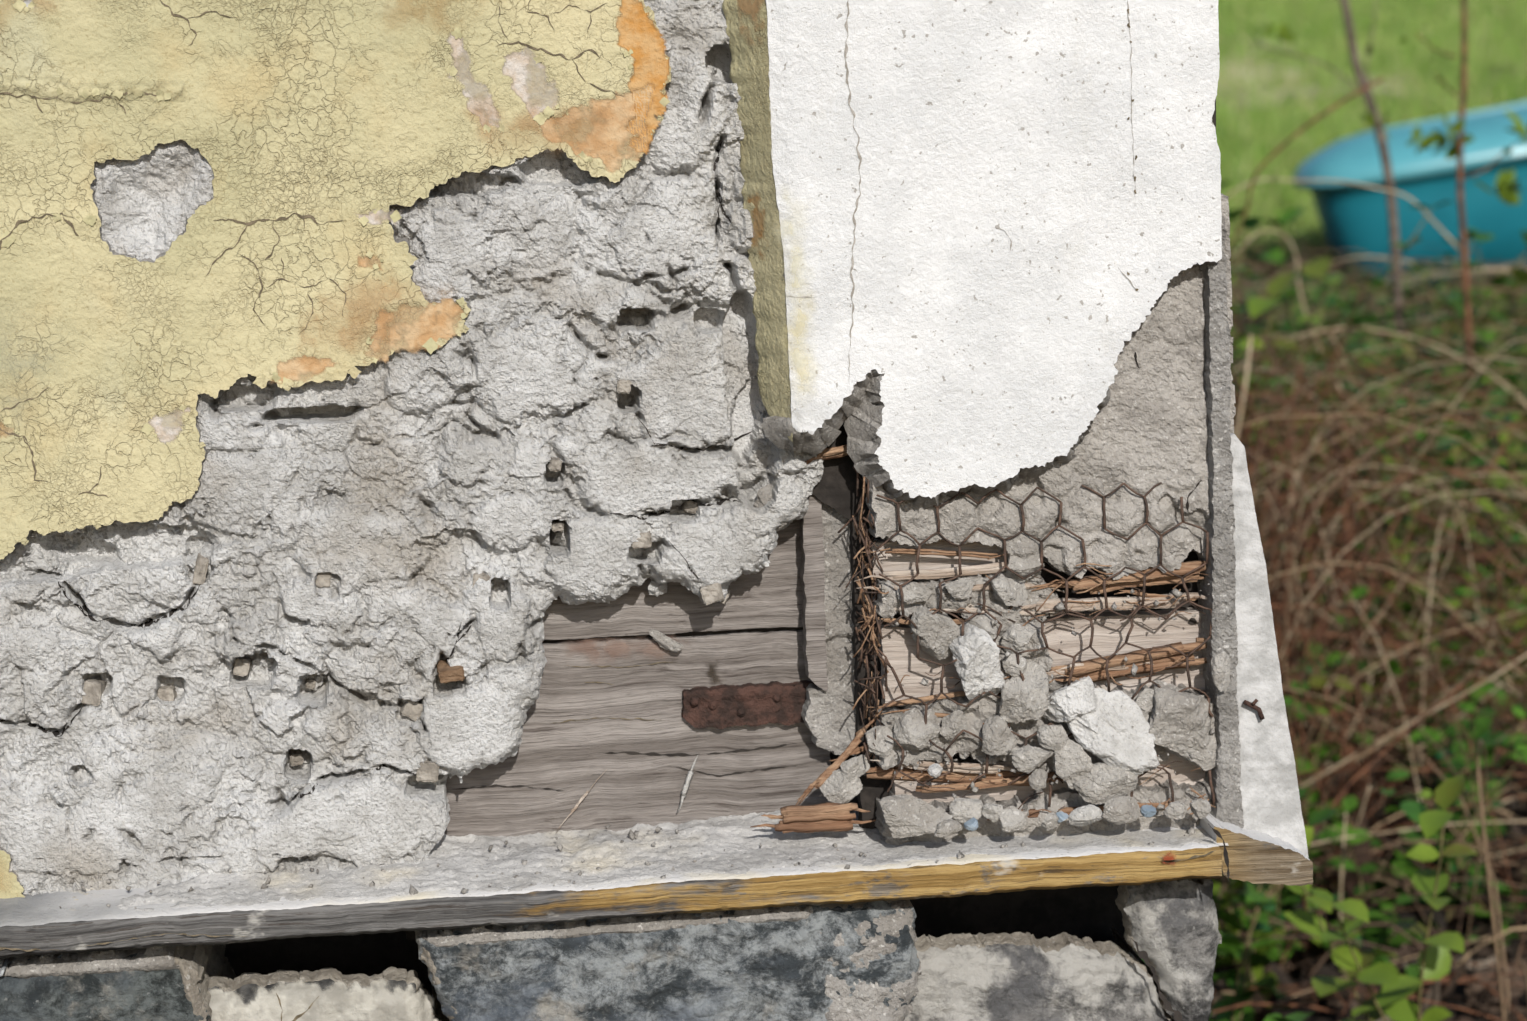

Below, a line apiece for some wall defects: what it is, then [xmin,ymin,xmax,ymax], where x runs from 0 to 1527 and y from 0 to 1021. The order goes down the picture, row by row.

crack [0,212,97,249]
flaking render [0,0,824,896]
crack [497,0,624,97]
crack [844,1,862,376]
flaking render [866,266,1211,580]
flaking render [1221,193,1236,434]